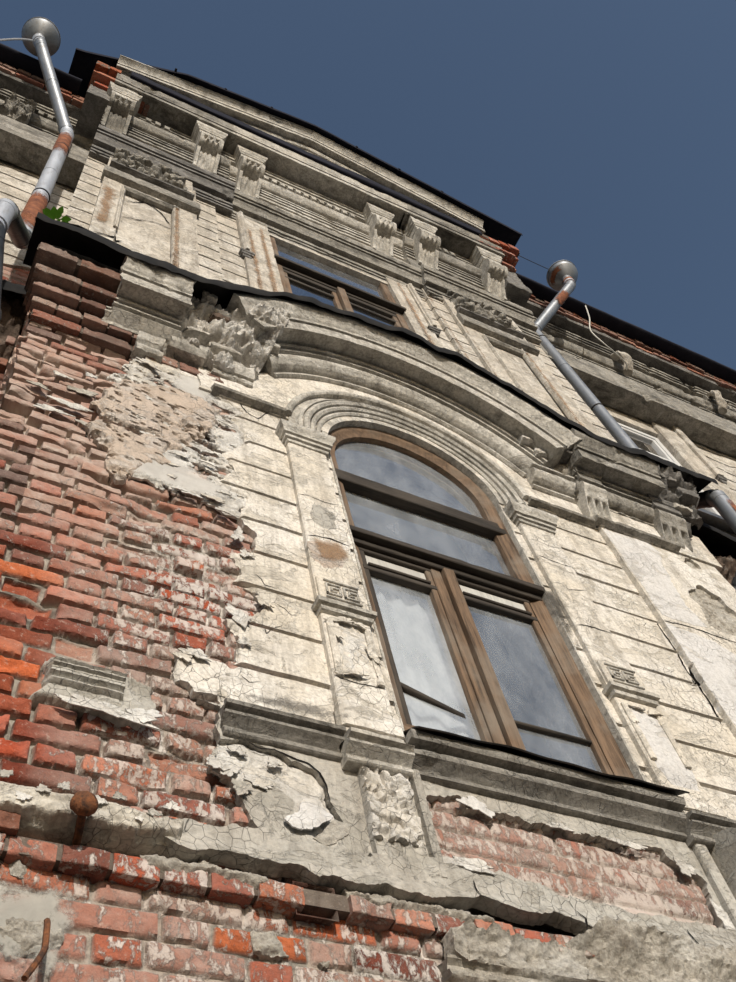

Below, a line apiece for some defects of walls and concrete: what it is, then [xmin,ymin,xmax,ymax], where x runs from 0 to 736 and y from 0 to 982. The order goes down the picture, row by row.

corrosion [52,132,73,154]
corrosion [21,192,48,229]
flaking render [0,312,350,846]
peeling [603,529,736,725]
crack [657,621,734,725]
crack [249,742,345,815]
peeling [627,703,701,792]
flaking render [428,796,736,930]
flaking render [0,860,445,982]